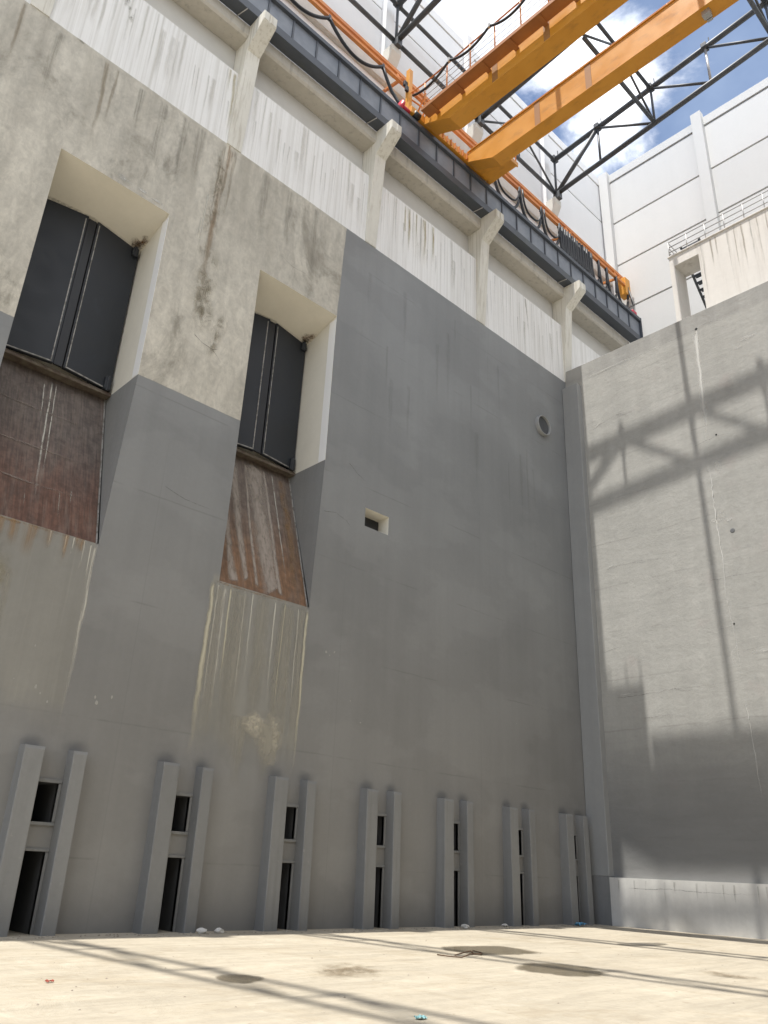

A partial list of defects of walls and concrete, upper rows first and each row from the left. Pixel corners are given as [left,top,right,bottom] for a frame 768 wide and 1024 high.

leakage [195,464,308,721]